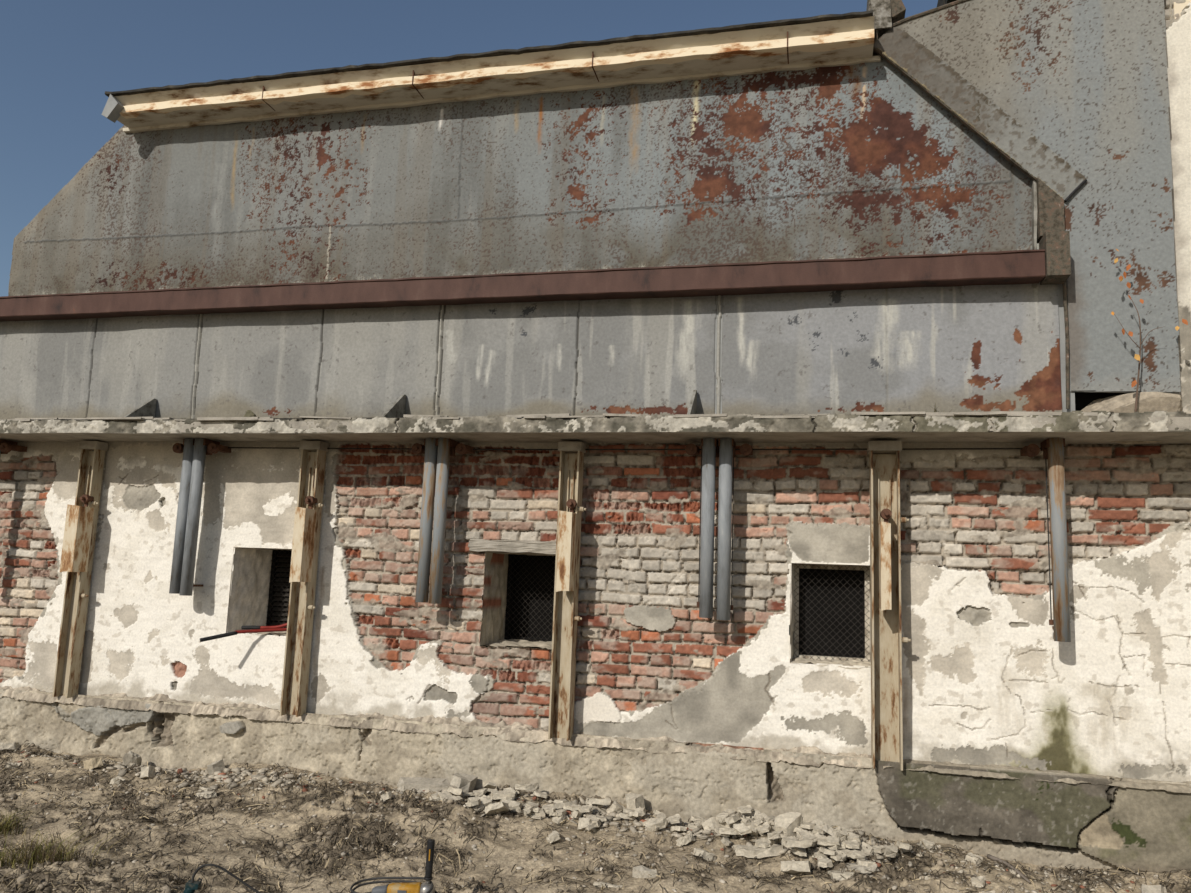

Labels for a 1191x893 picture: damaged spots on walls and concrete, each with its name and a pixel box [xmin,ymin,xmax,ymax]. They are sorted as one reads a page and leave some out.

rust [242,110,377,284]
rust [536,90,627,229]
rust [648,59,1009,256]
rust [960,328,1062,412]
spalling [0,448,81,723]
spalling [323,416,560,730]
spalling [504,414,903,752]
crack [951,570,996,596]
spalling [900,452,1052,696]
crack [929,580,1191,768]
spalling [1064,301,1191,684]
crack [908,778,1118,852]